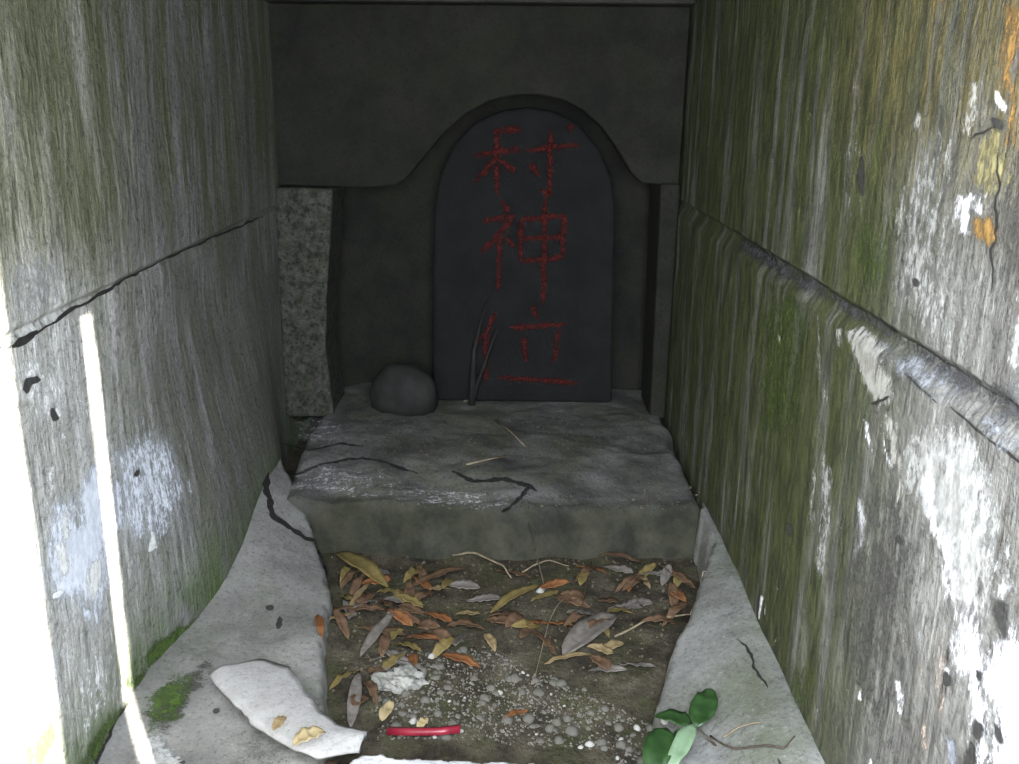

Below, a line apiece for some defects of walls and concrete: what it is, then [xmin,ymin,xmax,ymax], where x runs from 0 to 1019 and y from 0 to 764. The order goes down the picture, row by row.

rust [998,8,1019,144]
leakage [26,359,61,425]
crack [0,217,261,348]
peeling [836,326,902,468]
crack [735,231,1019,463]
rust [973,218,995,246]
crack [262,442,418,575]
crack [452,471,537,512]
leakage [40,423,192,731]
leakage [810,425,1019,764]
crack [737,639,768,687]